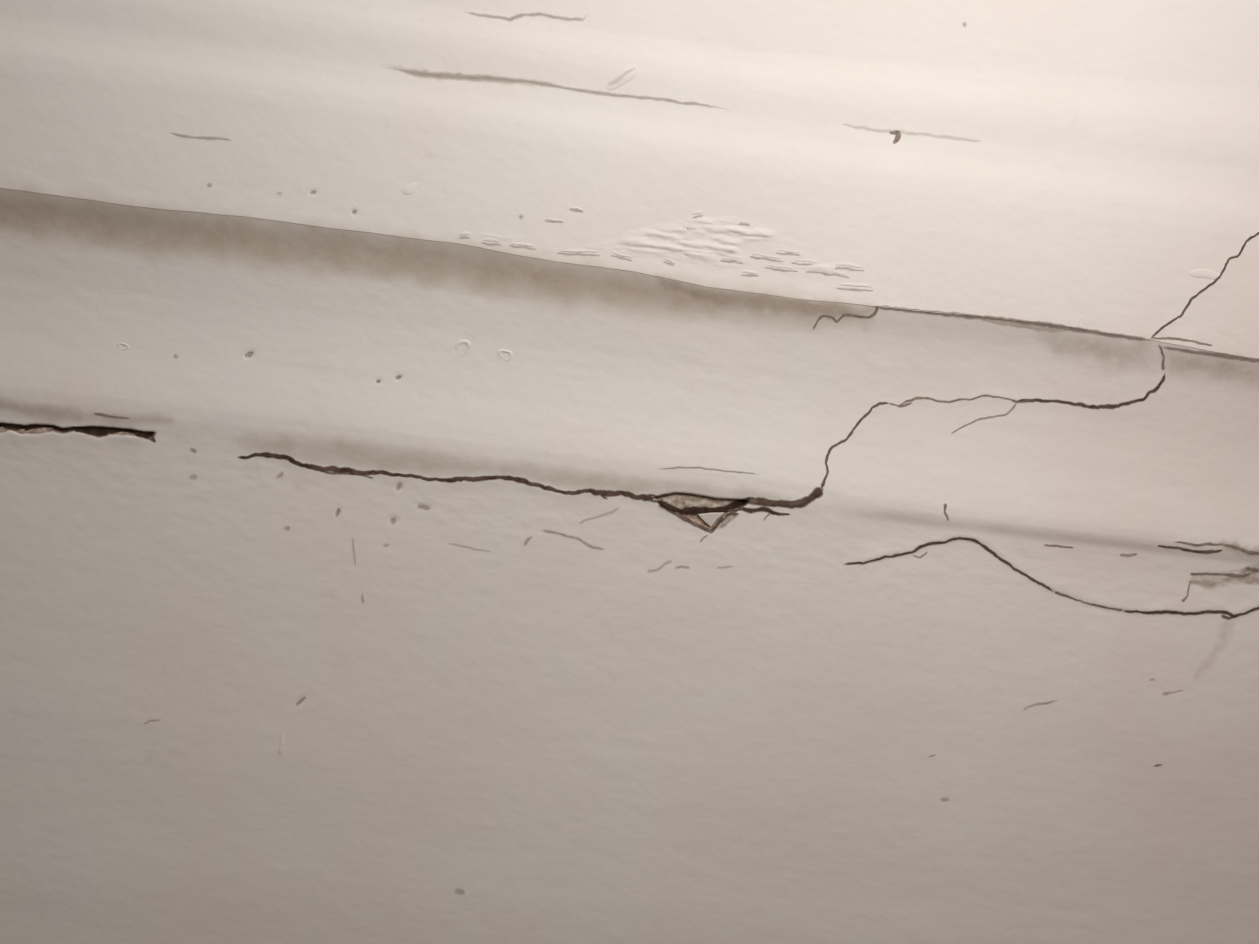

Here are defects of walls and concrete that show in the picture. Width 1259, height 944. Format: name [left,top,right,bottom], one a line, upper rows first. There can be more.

crack [724,232,1259,520]
crack [0,413,156,442]
crack [239,452,683,515]
spalling [655,493,749,533]
crack [846,504,1259,619]
peeling [1182,567,1259,601]